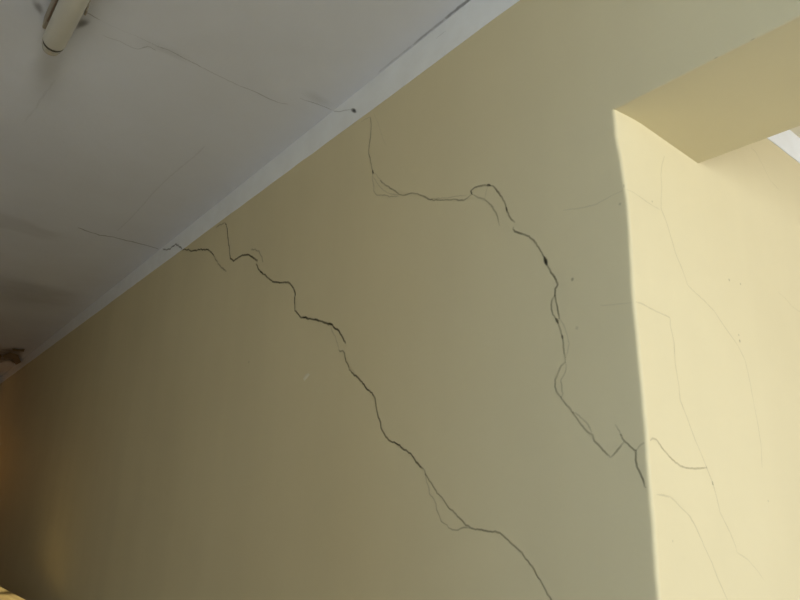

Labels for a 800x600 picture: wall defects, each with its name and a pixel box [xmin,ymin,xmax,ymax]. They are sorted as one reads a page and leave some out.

crack [164,224,374,396]